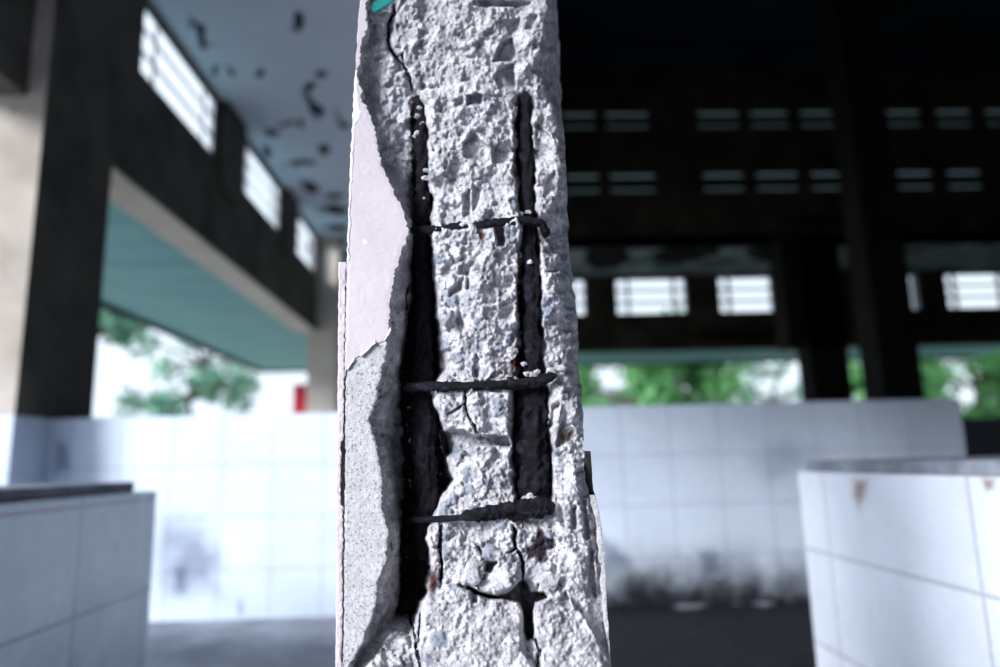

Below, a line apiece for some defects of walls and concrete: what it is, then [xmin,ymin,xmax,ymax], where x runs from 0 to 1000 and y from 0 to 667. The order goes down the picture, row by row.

crack [386,6,412,89]
peeling [584,246,632,270]
spalling [262,0,611,667]
crack [453,390,482,437]
crack [437,524,559,599]